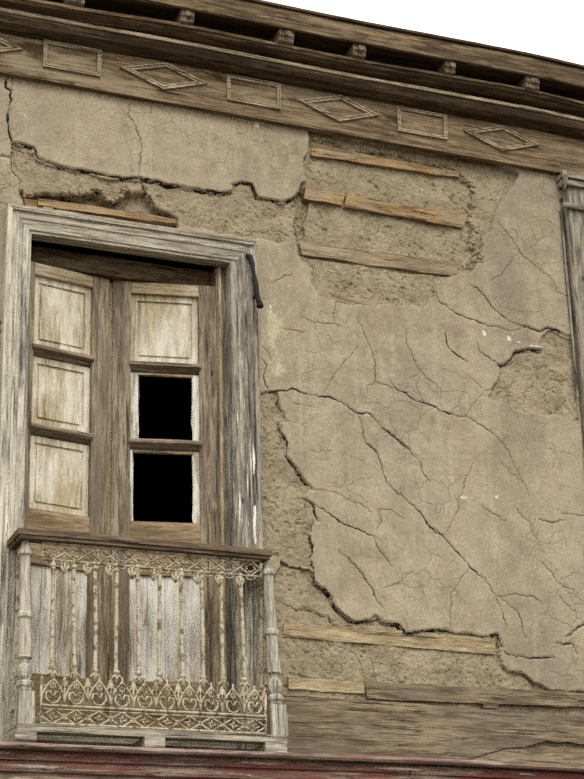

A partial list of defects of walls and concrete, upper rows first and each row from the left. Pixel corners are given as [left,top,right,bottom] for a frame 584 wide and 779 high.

crack [0,77,295,228]
spalling [11,132,517,308]
crack [262,223,584,690]
spalling [239,391,558,700]
spalling [494,705,584,715]